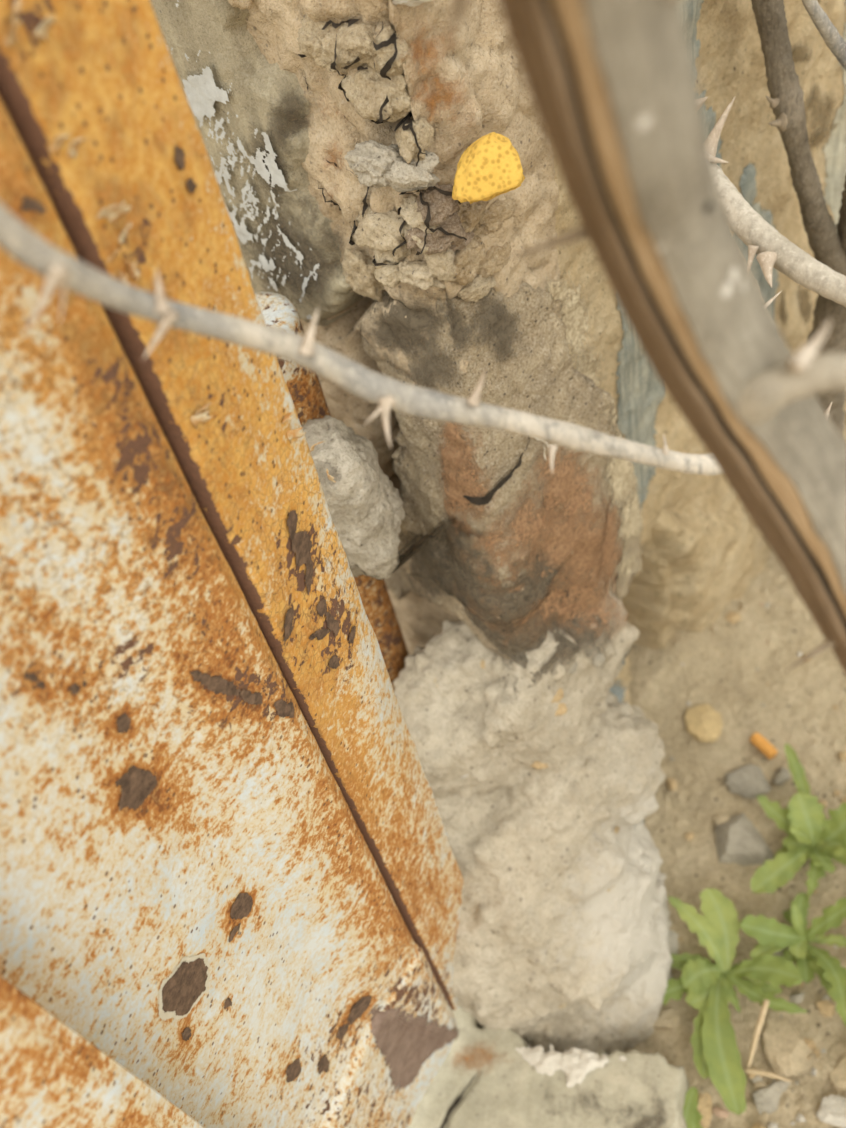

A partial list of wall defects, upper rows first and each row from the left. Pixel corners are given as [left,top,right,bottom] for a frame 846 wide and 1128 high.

peeling [167,45,319,319]
crack [298,19,467,266]
crack [440,1073,478,1128]